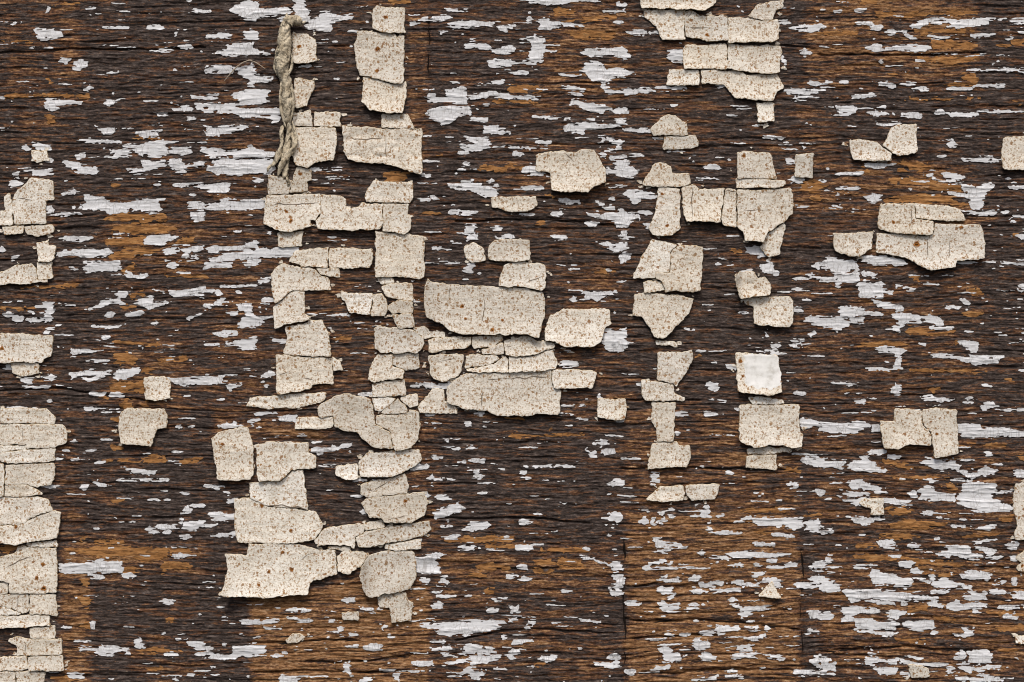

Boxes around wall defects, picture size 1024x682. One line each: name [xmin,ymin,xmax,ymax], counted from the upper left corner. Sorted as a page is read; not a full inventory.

peeling [640,0,784,123]
peeling [0,177,80,289]
peeling [833,124,986,282]
peeling [1001,136,1024,170]
peeling [0,333,54,377]
peeling [99,0,627,623]
peeling [632,114,829,473]
peeling [0,407,193,682]
peeling [646,483,720,502]
peeling [853,498,976,578]
peeling [880,407,1007,491]
peeling [962,482,1024,572]